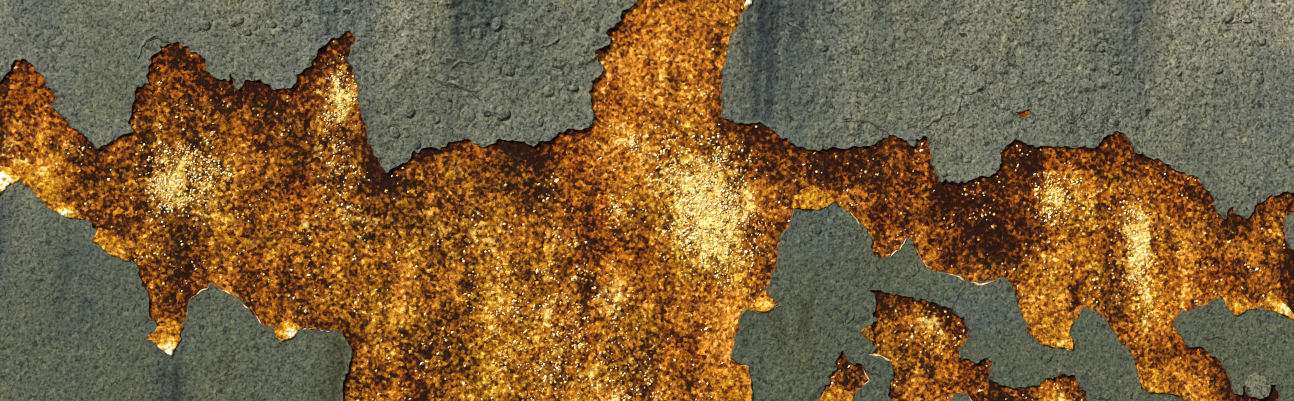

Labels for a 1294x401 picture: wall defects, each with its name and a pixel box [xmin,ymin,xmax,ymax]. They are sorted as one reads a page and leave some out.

corrosion [820,291,1086,401]
peeling [1245,373,1271,399]